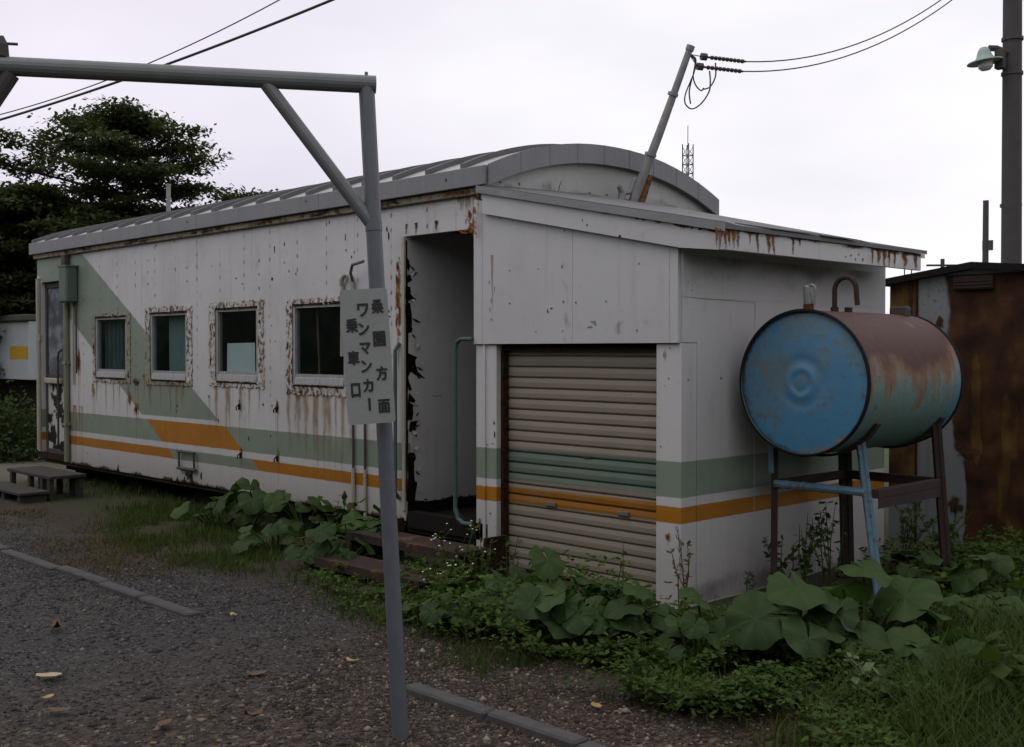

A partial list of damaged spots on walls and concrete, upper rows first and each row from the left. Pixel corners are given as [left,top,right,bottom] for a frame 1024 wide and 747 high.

corrosion [438,189,479,239]
corrosion [714,227,822,253]
corrosion [846,245,921,267]
corrosion [890,280,916,315]
peeling [92,312,131,384]
peeling [144,305,193,387]
peeling [208,296,346,398]
corrosion [113,374,151,414]
corrosion [262,394,343,429]
corrosion [936,272,1024,547]
corrosion [889,444,915,486]